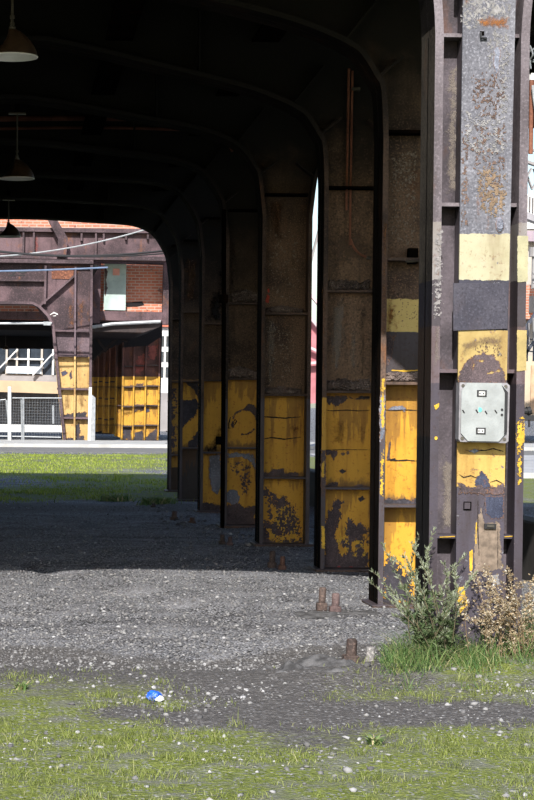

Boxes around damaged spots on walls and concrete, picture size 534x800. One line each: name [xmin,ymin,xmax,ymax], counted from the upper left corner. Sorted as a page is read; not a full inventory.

peeling [461,0,511,30]
peeling [460,29,511,227]
corrosion [470,72,508,218]
peeling [432,230,444,317]
peeling [122,382,199,461]
peeling [187,429,303,543]
peeling [320,449,369,567]
peeling [326,378,416,504]
peeling [458,471,505,587]
peeling [458,352,506,383]